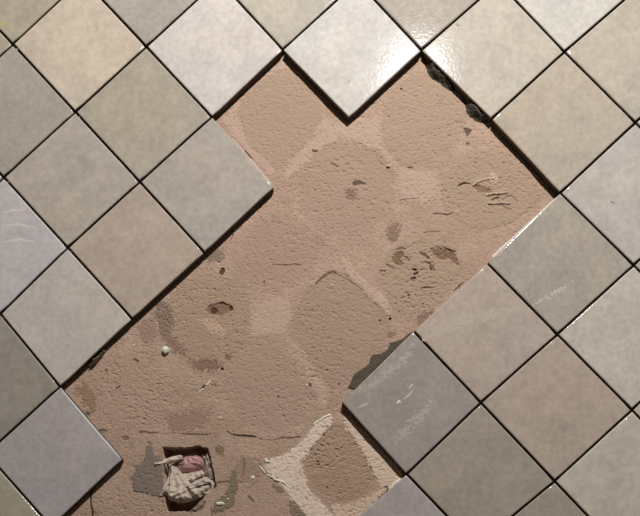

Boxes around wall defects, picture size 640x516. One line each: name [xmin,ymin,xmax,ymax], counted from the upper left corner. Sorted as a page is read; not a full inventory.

hole [345,180,366,202]
spalling [385,223,410,269]
spalling [419,248,460,271]
peeling [492,198,556,257]
hole [207,302,233,316]
peeling [62,390,120,458]